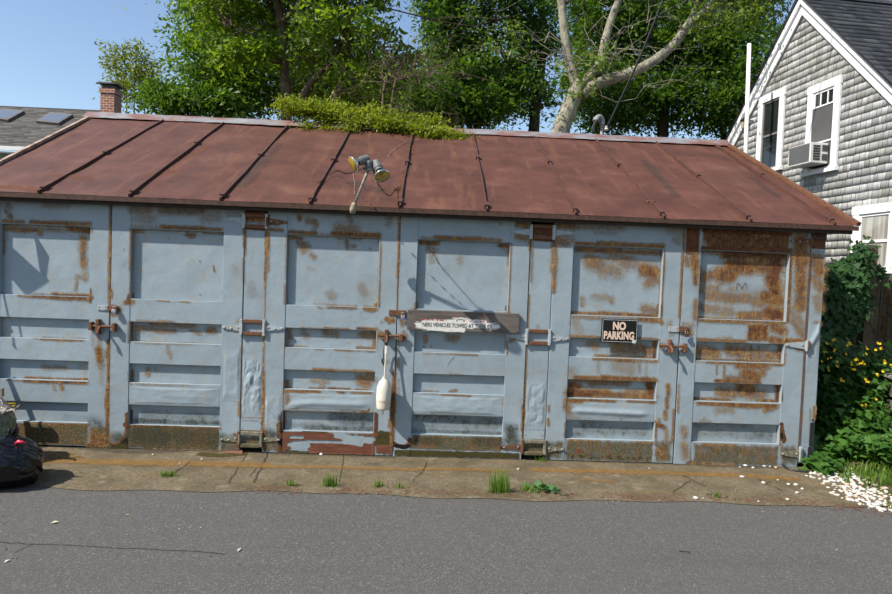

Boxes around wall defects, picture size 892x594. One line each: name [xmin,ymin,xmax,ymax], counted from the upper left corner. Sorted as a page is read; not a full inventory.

corrosion [2,209,93,303]
corrosion [241,211,407,352]
corrosion [419,221,829,482]
damp [24,410,278,451]
peeling [283,431,375,455]
corrosion [354,361,412,449]